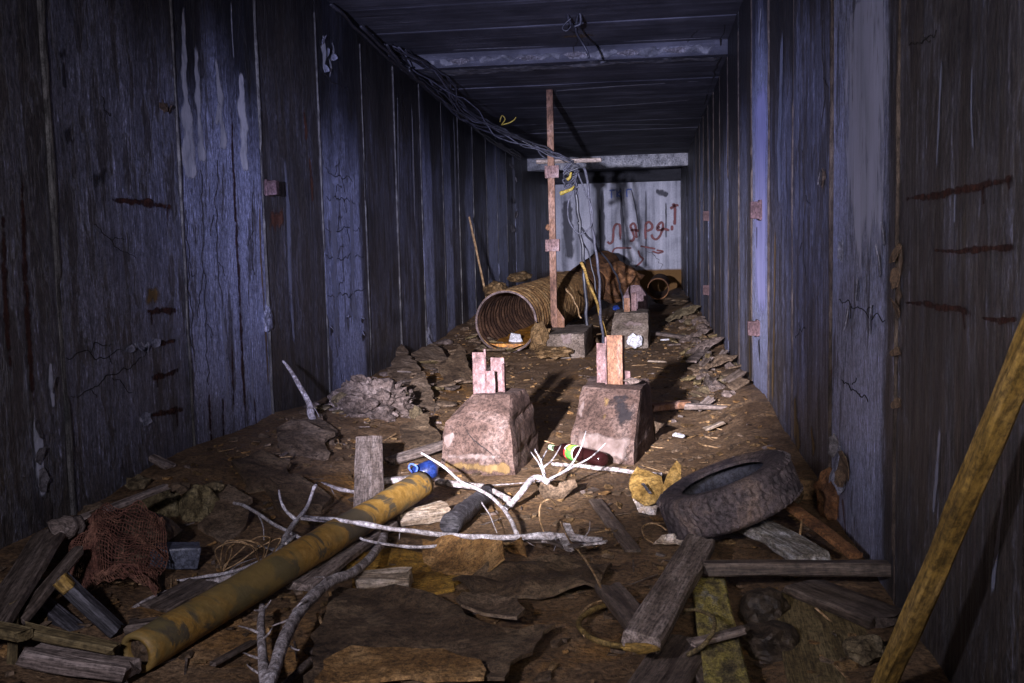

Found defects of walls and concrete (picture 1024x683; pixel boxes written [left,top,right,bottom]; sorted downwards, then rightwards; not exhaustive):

spalling [321,35,338,76]
water stain [180,10,206,178]
water stain [215,60,227,149]
water stain [237,74,248,171]
corrosion [113,198,171,221]
crack [324,162,365,301]
corrosion [907,175,1012,204]
corrosion [934,244,1013,254]
crack [839,299,885,323]
crack [66,342,147,398]